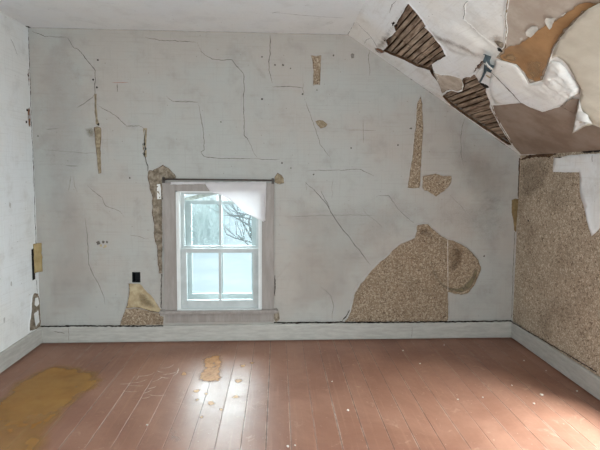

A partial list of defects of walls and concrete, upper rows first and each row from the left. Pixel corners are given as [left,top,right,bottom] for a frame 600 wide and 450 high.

crack [11,28,124,244]
peeling [93,123,102,174]
crack [140,126,148,173]
crack [149,30,279,160]
peeling [311,55,322,86]
crack [268,39,368,262]
peeling [382,0,600,236]
peeling [28,292,41,332]
spalling [31,243,43,280]
spalling [120,282,163,325]
spalling [147,164,177,274]
peeling [345,223,483,322]